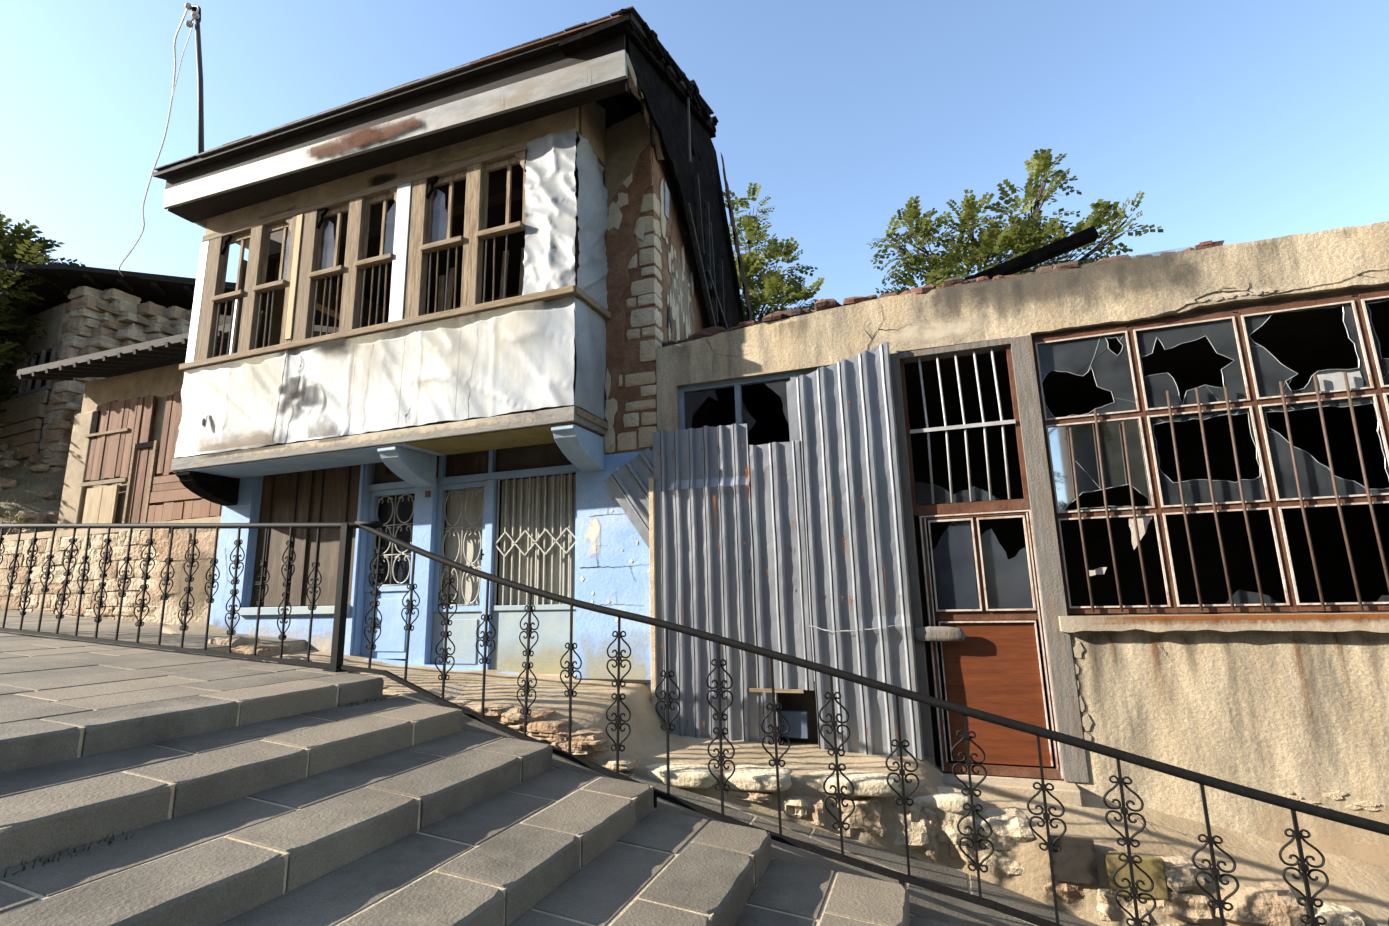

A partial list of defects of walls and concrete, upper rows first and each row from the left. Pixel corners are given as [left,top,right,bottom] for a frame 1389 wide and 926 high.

corrosion [307,117,420,157]
flaking render [604,53,694,451]
crack [1150,269,1389,318]
peeling [585,493,613,556]